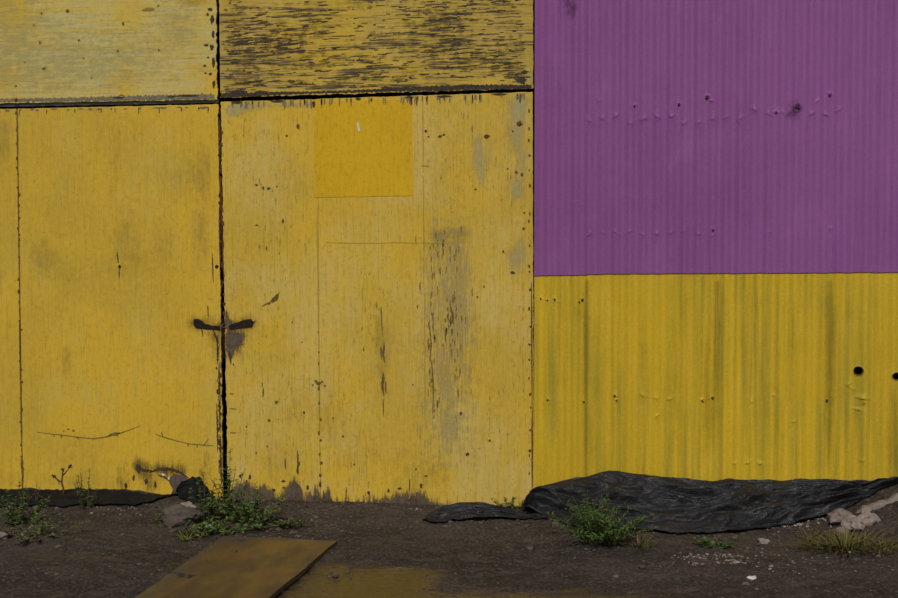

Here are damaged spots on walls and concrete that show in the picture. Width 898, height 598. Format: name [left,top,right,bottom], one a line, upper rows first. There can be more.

peeling [0,0,531,316]
peeling [419,231,466,418]